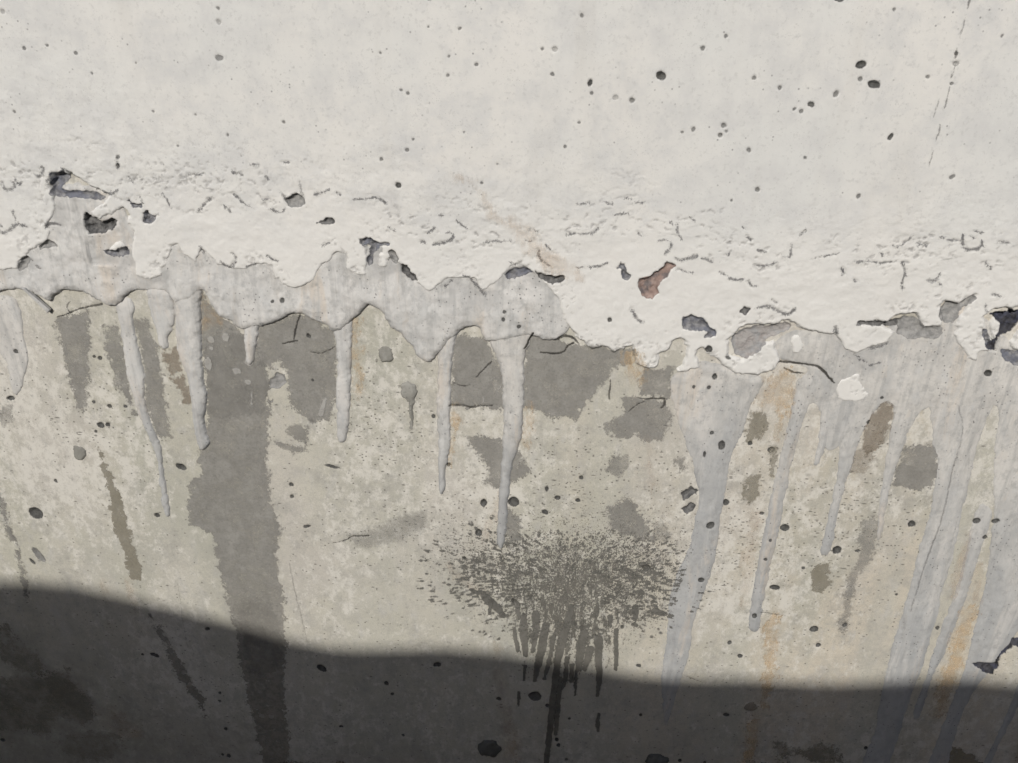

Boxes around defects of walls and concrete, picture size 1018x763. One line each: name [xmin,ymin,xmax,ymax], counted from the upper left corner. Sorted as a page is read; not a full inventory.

spalling [36,165,118,200]
spalling [84,212,117,234]
spalling [359,238,417,280]
spalling [577,221,757,299]
spalling [682,314,716,338]
spalling [856,293,1018,366]
damp [52,310,191,438]
damp [451,333,504,411]
damp [523,336,637,422]
damp [99,450,142,581]
damp [187,292,338,763]
damp [417,498,711,763]